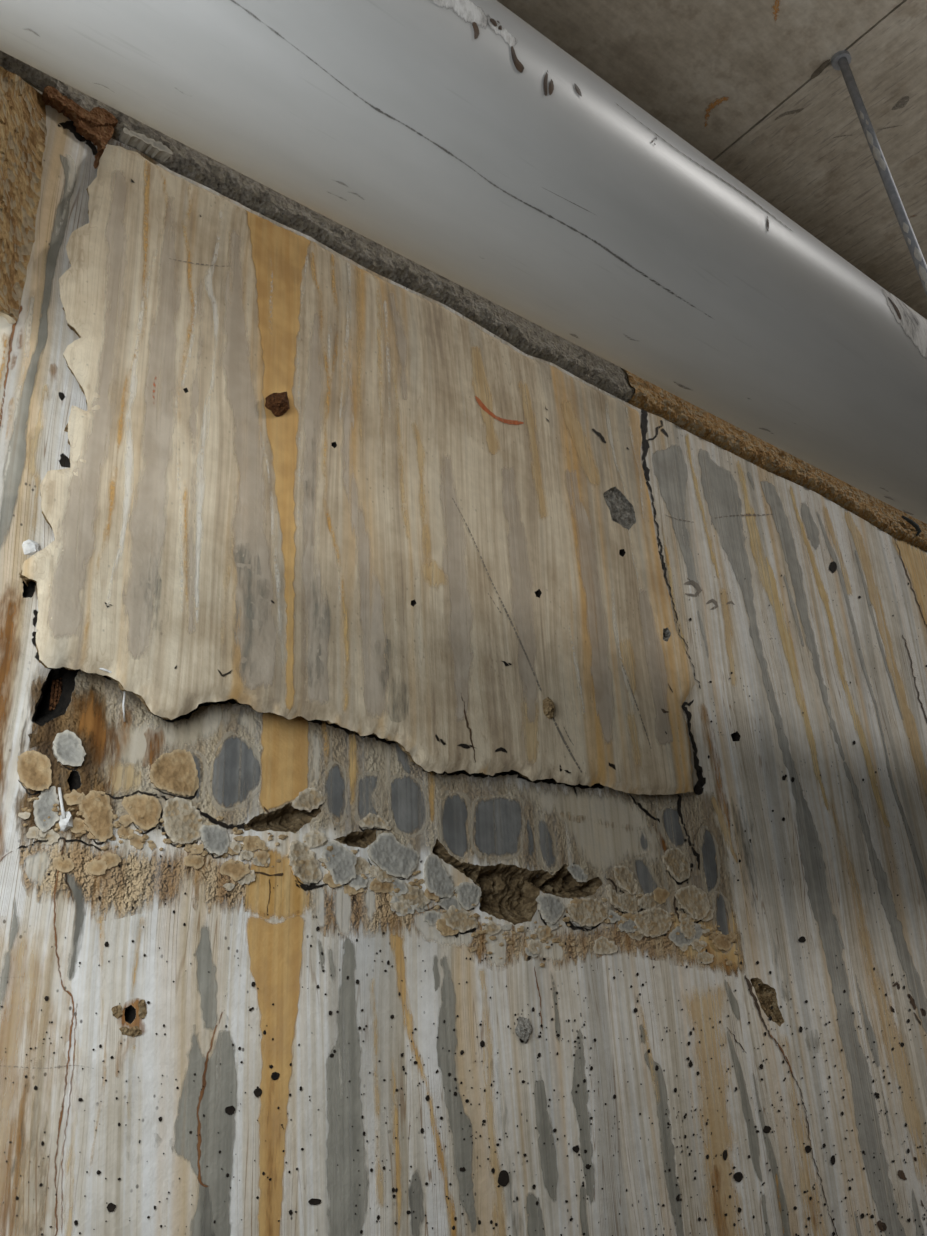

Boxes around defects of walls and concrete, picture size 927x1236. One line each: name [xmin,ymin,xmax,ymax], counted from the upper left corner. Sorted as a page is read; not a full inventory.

rust [42,86,118,169]
spalling [0,46,927,552]
crack [59,453,70,468]
crack [32,610,131,692]
rust [247,211,362,810]
crack [422,409,706,870]
peeling [17,667,784,1026]
water stain [652,445,927,1236]
spalling [111,999,147,1037]
water stain [174,927,237,1236]
rust [247,916,304,1236]
water stain [318,938,369,1236]